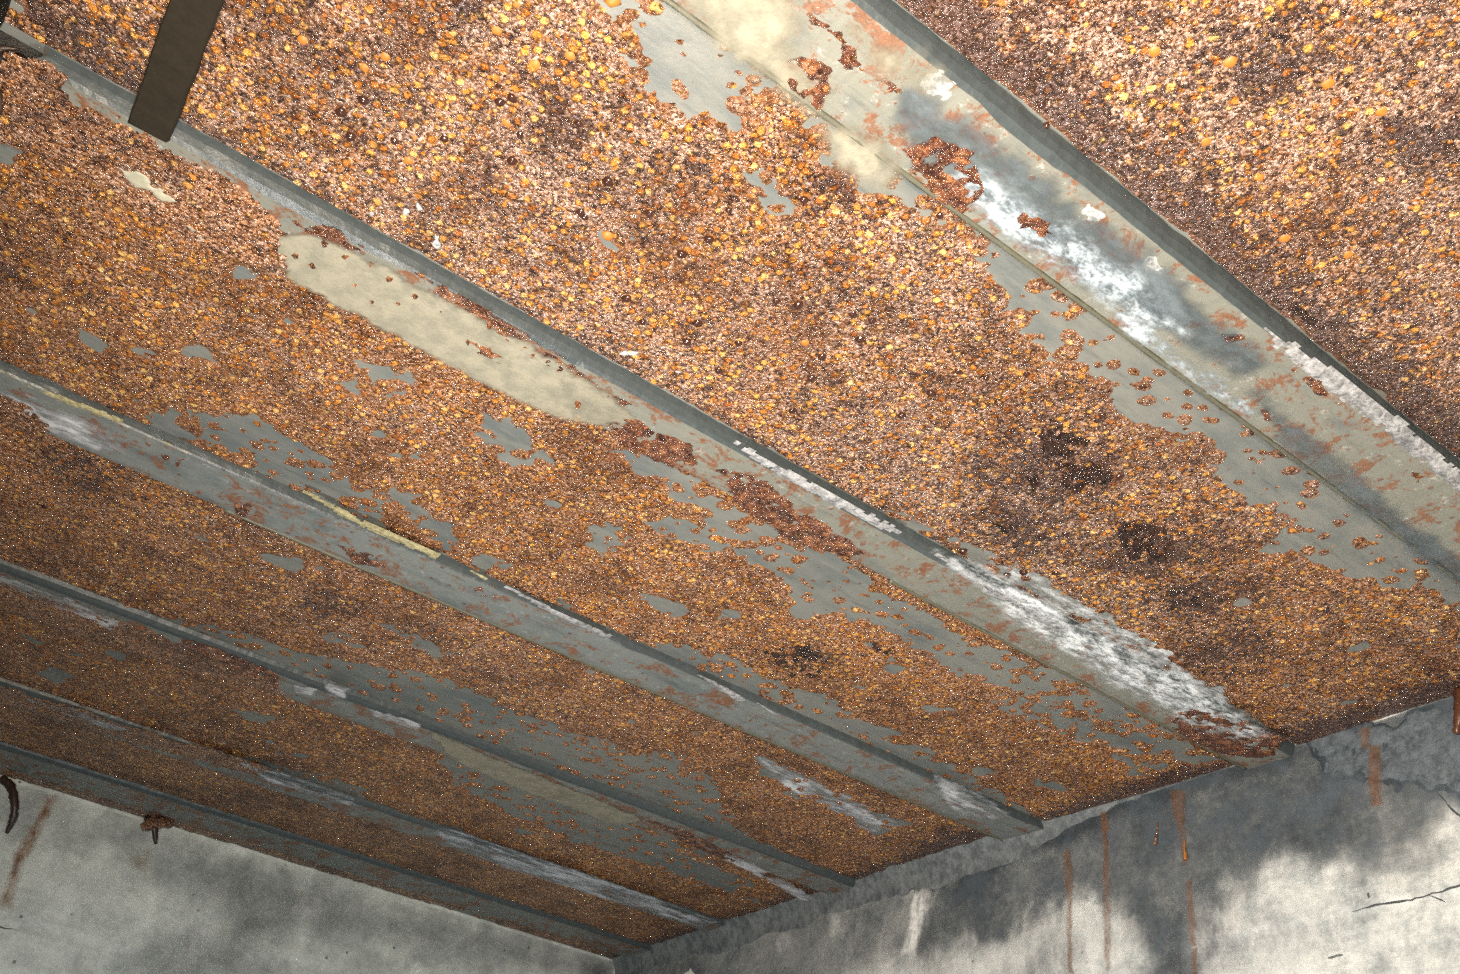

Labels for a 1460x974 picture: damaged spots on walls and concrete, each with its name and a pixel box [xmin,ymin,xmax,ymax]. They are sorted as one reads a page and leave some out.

corrosion [4,0,170,95]
peeling [277,235,634,424]
water stain [967,180,1253,413]
corrosion [895,0,1460,459]
peeling [302,490,441,559]
corrosion [0,391,988,959]
peeling [504,586,612,639]
corrosion [0,51,1288,821]
peeling [733,440,902,535]
water stain [951,559,1262,743]
water stain [922,696,1460,974]
crack [1352,885,1460,912]